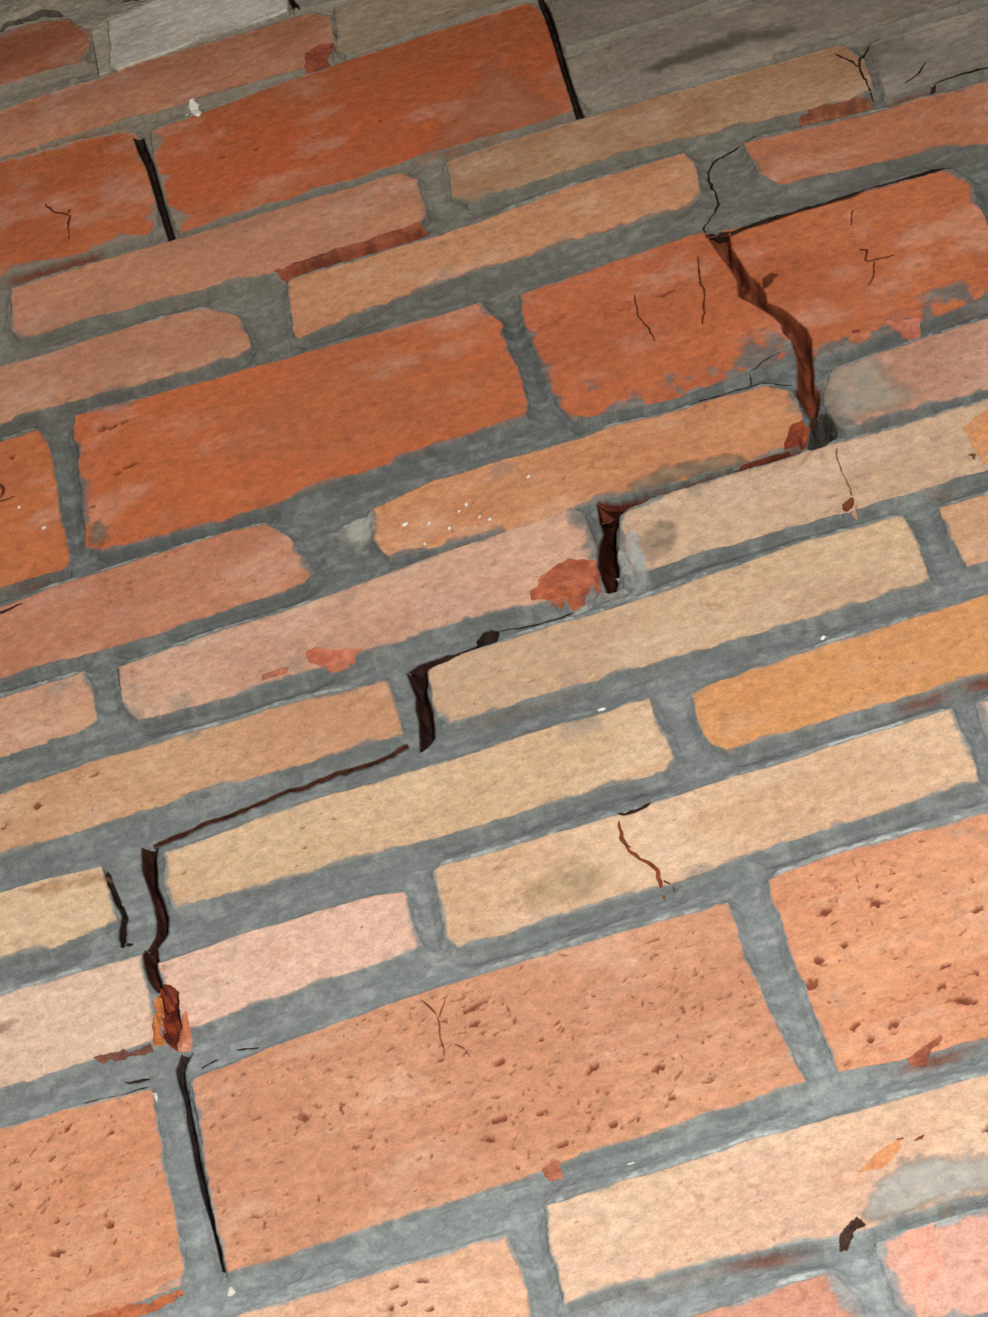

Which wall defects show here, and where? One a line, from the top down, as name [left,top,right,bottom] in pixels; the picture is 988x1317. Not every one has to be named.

crack [537,0,585,120]
crack [45,204,71,239]
crack [132,137,176,242]
crack [595,136,948,594]
spalling [530,558,651,617]
crack [102,612,574,993]
crack [618,802,676,900]
spalling [94,984,193,1064]
crack [422,998,470,1056]
crack [83,1047,259,1273]
spalling [839,1217,867,1252]